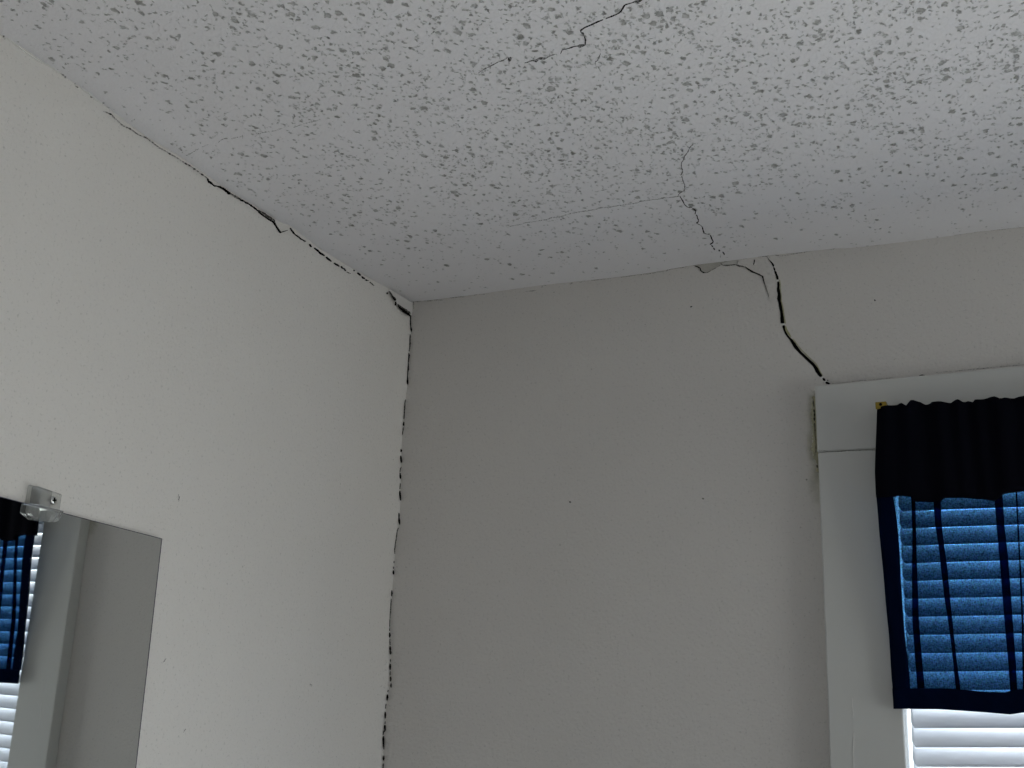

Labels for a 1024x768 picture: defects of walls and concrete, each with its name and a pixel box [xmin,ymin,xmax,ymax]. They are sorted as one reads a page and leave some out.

crack [481,0,642,71]
crack [3,36,456,768]
crack [541,144,861,468]